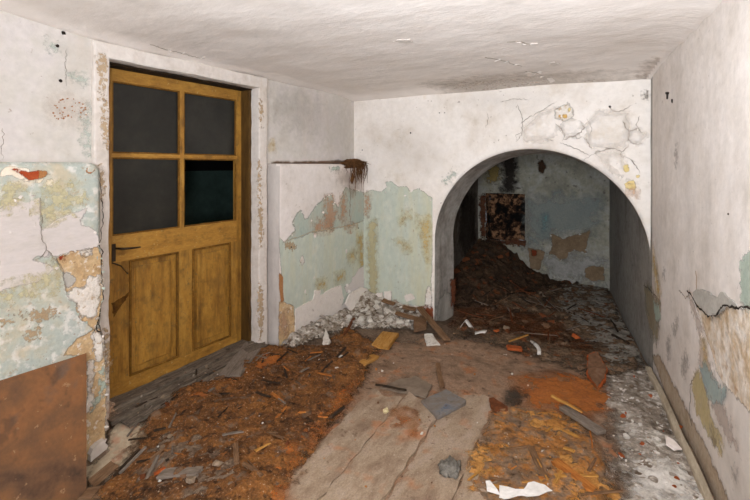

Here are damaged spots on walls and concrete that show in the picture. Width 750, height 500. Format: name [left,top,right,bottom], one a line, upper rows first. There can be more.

peeling [555,104,574,121]
crack [546,105,641,172]
peeling [0,166,54,186]
peeling [623,165,640,194]
peeling [278,181,457,346]
peeling [478,193,607,284]
crack [679,271,750,318]
peeling [0,195,113,462]
spalling [652,289,750,500]